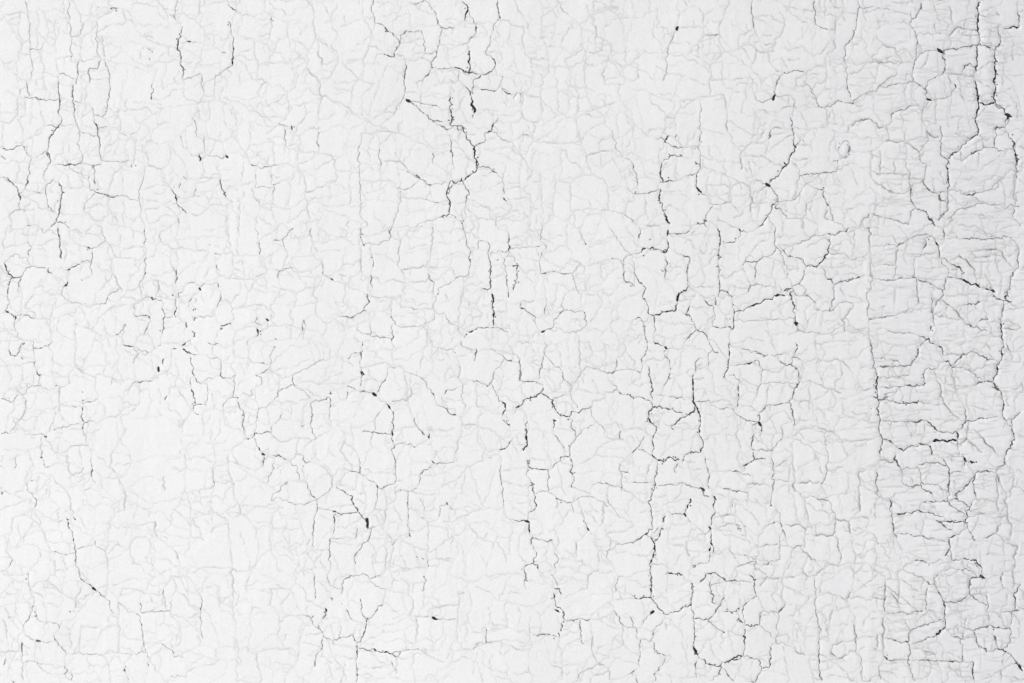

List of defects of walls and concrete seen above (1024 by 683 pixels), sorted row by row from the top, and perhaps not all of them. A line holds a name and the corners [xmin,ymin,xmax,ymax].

crack [1,1,148,491]
crack [133,0,581,591]
crack [405,2,1023,683]
crack [3,518,174,683]
crack [305,569,430,682]